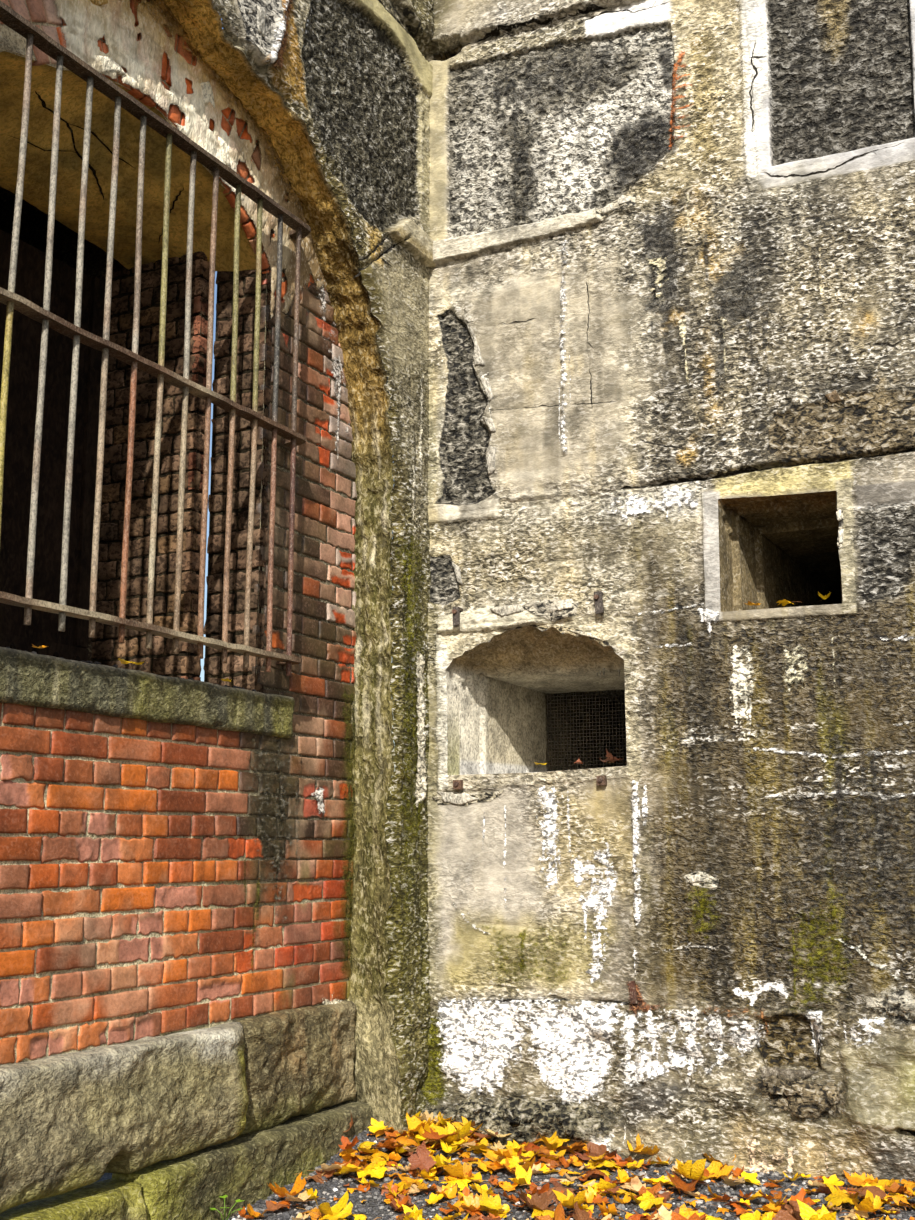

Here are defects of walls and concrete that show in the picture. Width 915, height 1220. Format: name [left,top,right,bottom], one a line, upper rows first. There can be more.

crack [8,91,136,200]
crack [158,187,184,244]
peeling [55,0,339,468]
spalling [595,195,637,222]
corrosion [669,51,692,149]
crack [745,36,766,133]
crack [764,142,904,177]
spalling [436,309,496,505]
water stain [415,652,427,807]
efflorescence [536,786,618,983]
efflorescence [631,780,649,926]
efflorescence [436,982,789,1105]